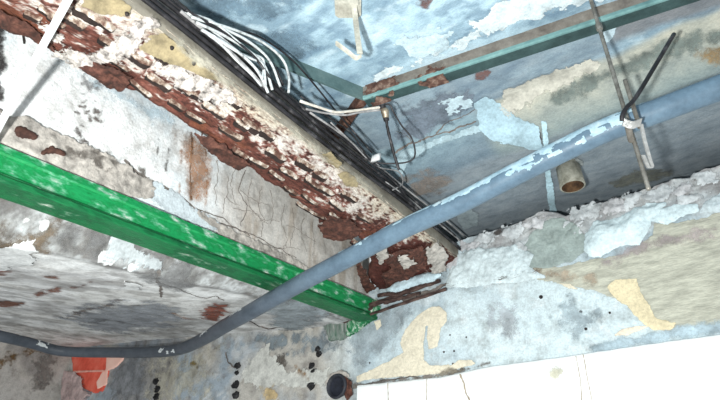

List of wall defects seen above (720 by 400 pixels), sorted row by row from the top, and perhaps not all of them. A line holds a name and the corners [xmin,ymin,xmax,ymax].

corrosion [0,10,55,53]
corrosion [78,61,132,92]
corrosion [180,131,250,200]
flaking render [0,109,309,272]
crack [124,151,316,258]
corrosion [317,215,362,243]
corrosion [356,263,376,293]
flaking render [376,248,418,269]
corrosion [381,245,427,288]
flaking render [426,169,720,328]
corrosion [202,303,229,321]
flaking render [60,371,92,400]